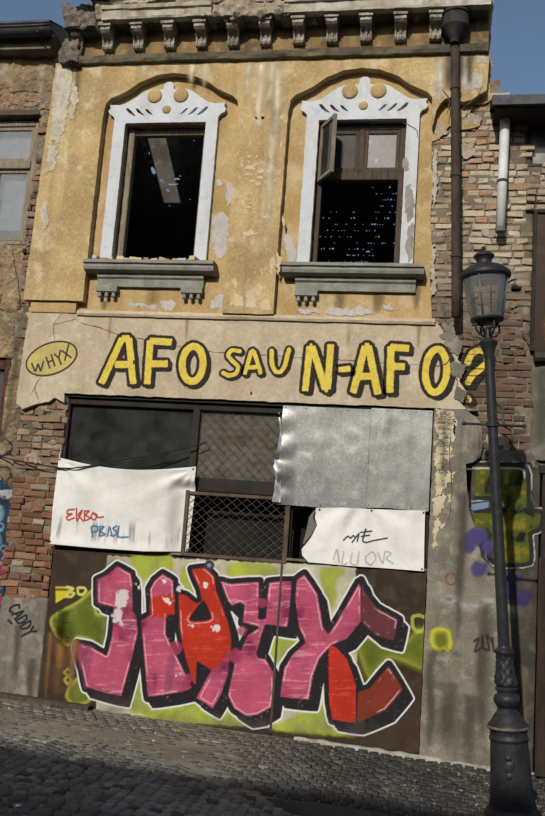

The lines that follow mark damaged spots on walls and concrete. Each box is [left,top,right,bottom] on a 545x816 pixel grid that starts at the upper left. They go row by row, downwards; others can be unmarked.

spalling [450,105,483,126]
spalling [460,142,477,159]
spalling [0,66,79,337]
peeling [211,179,233,258]
peeling [237,151,298,275]
peeling [405,183,415,262]
peeling [128,299,176,311]
peeling [210,279,272,311]
spalling [297,305,374,316]
crack [53,316,145,340]
peeling [432,409,458,549]